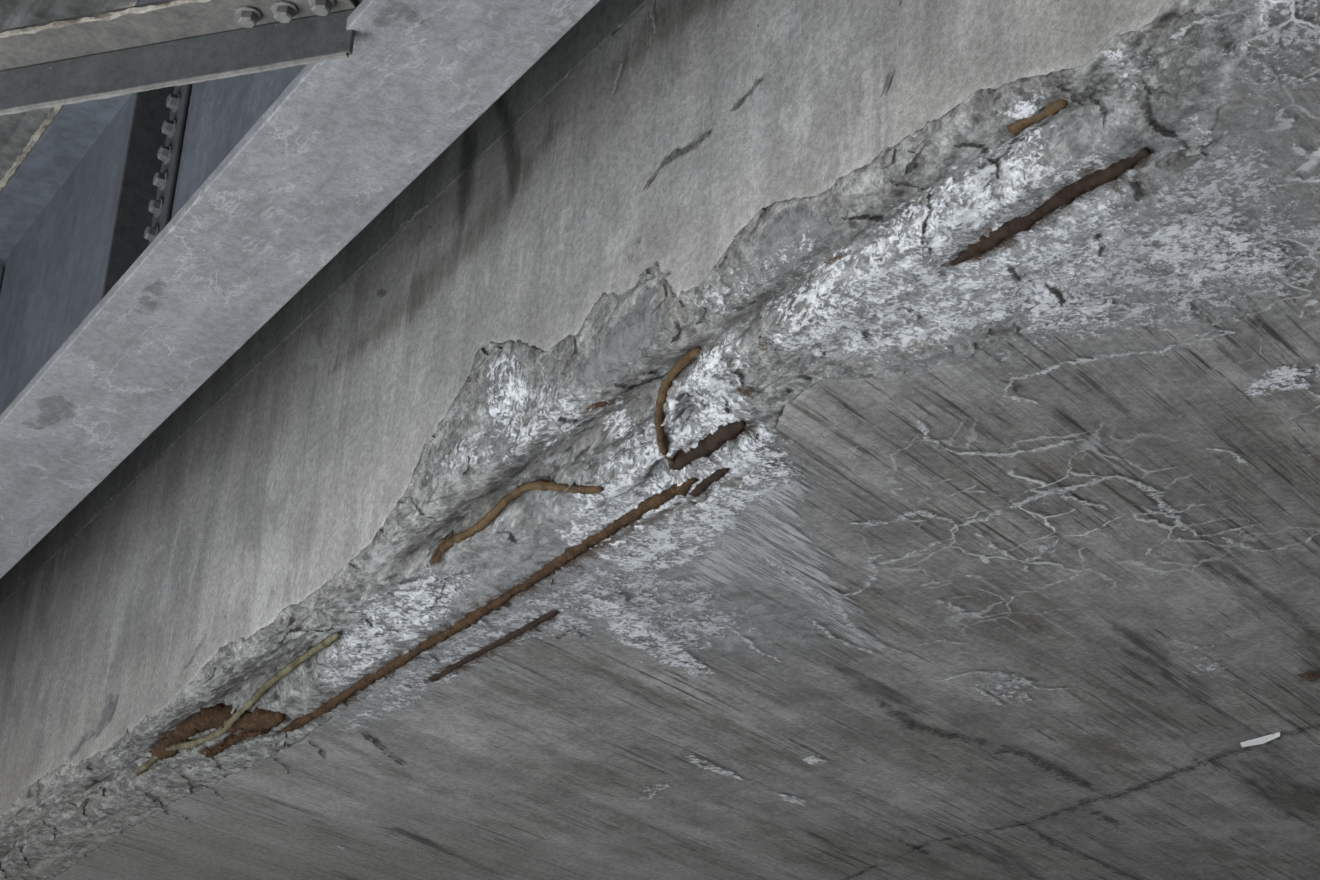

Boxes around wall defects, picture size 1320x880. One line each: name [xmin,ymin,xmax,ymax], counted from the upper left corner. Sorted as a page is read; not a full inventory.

crack [1169,0,1320,70]
water stain [314,0,1320,733]
spalling [391,0,1275,562]
crack [920,187,934,255]
corrosion [944,151,1153,268]
crack [1003,329,1235,404]
crack [1283,119,1320,318]
corrosion [176,730,254,757]
spalling [0,477,699,880]
corrosion [275,489,710,735]
crack [760,419,1320,706]
crack [822,699,1320,880]